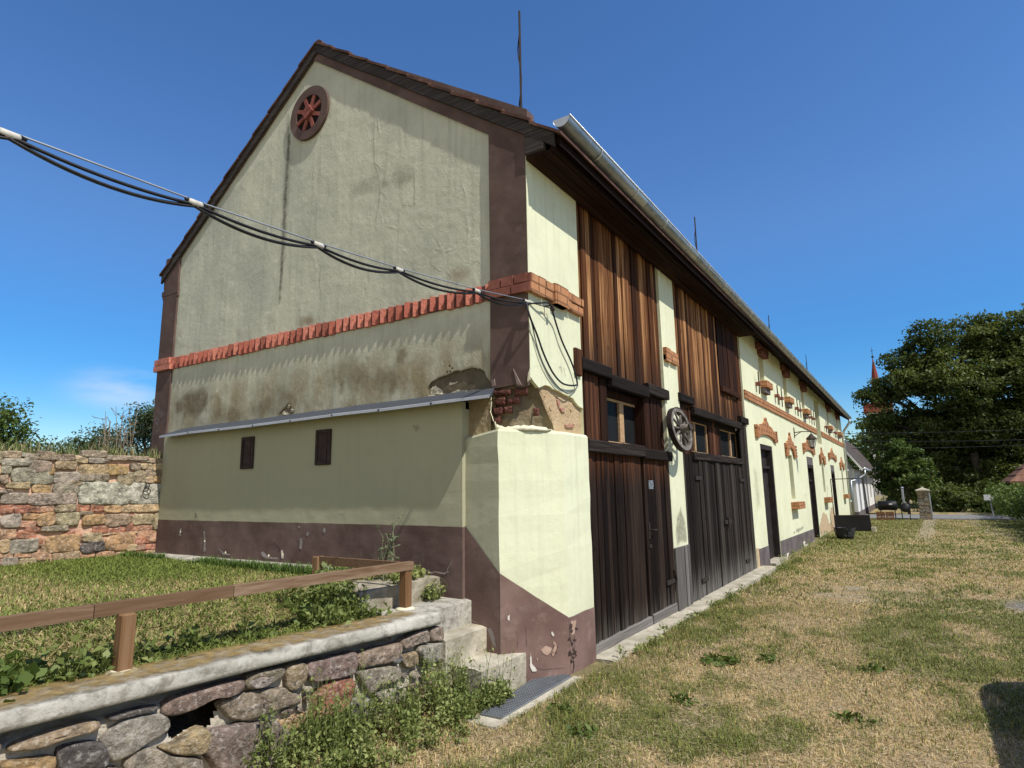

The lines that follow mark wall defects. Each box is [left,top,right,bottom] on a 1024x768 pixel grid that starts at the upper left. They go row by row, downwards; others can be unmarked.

water stain [279,137,290,299]
flaking render [428,365,581,437]
peeling [530,620,578,672]